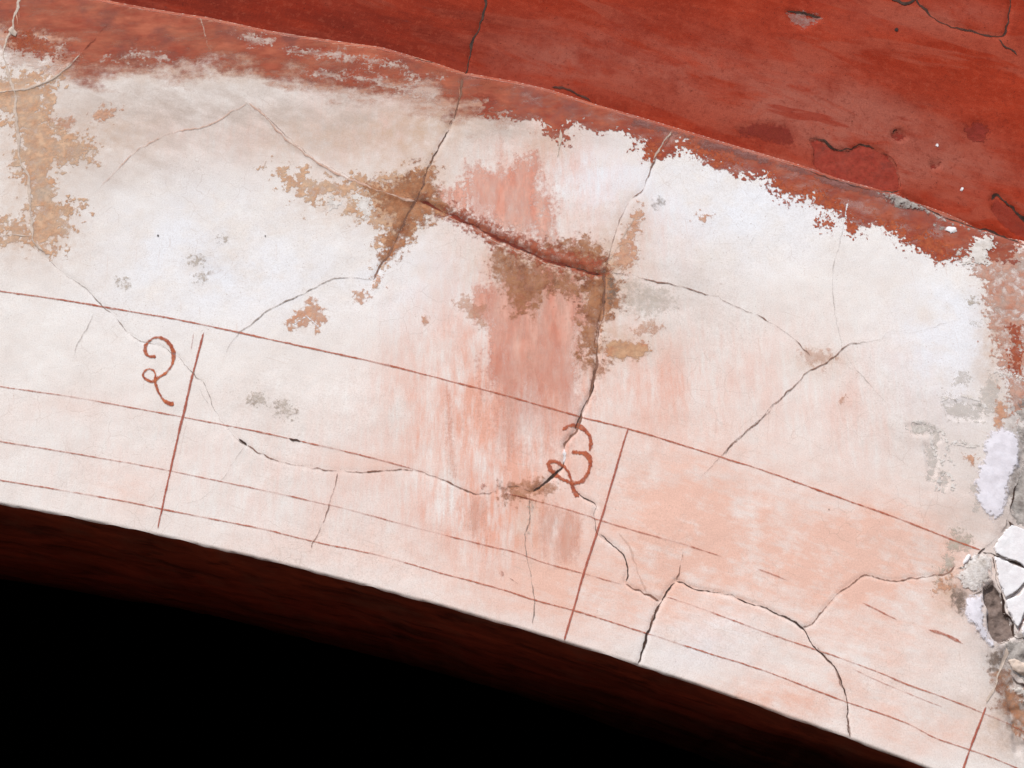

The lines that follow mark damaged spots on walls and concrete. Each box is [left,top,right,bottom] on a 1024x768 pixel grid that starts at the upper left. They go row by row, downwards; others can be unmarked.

damp [438,152,559,245]
peeling [0,0,1024,451]
crack [793,165,1024,244]
crack [124,0,767,622]
damp [461,264,626,394]
crack [723,342,856,454]
damp [498,476,555,506]
flaking render [905,419,985,493]
crack [576,491,954,736]
spalling [956,461,1024,704]
crack [986,629,1020,703]